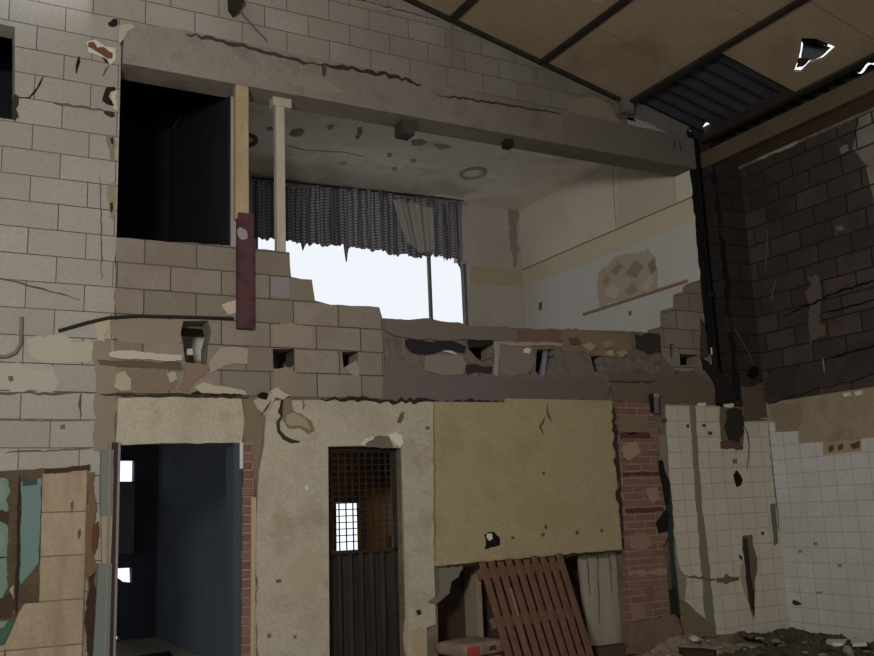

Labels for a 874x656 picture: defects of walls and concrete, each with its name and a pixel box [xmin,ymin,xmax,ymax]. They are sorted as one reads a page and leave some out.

crack [353,0,438,21]
spalling [87,19,136,64]
crack [186,33,563,114]
crack [0,278,80,300]
peeling [597,247,659,307]
crack [783,280,874,317]
spalling [383,318,662,400]
spalling [361,412,404,448]
peeling [719,383,769,450]
peeling [619,403,757,638]
peeling [0,464,98,656]